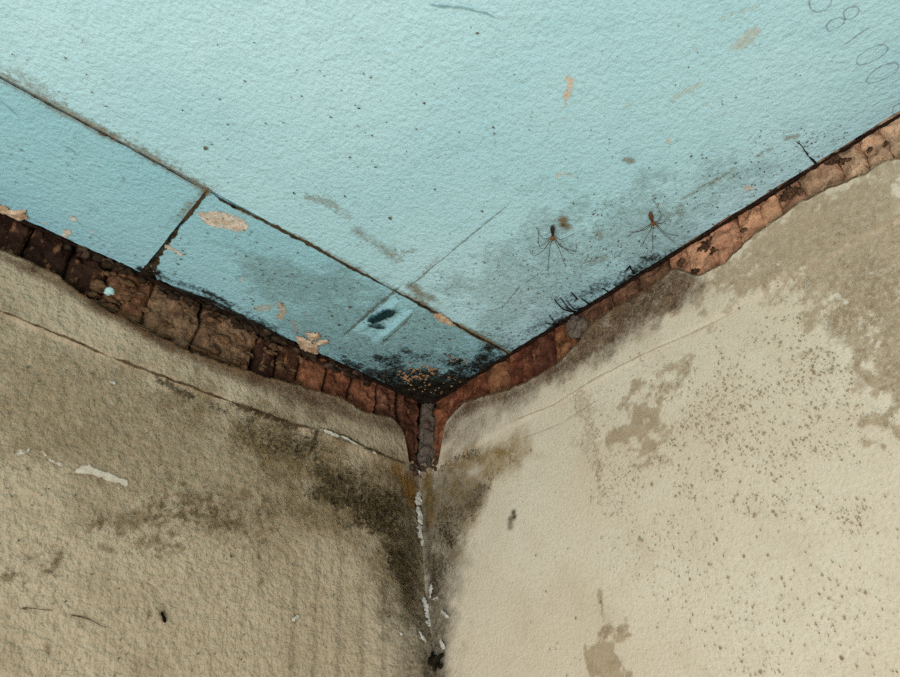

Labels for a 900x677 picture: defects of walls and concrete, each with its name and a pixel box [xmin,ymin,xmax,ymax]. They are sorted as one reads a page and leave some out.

peeling [75,465,128,486]
crack [0,311,408,464]
damp [8,257,514,677]
crack [0,78,900,404]
flaking render [0,111,900,480]
damp [281,125,848,404]
damp [445,271,707,436]
damp [570,188,899,677]